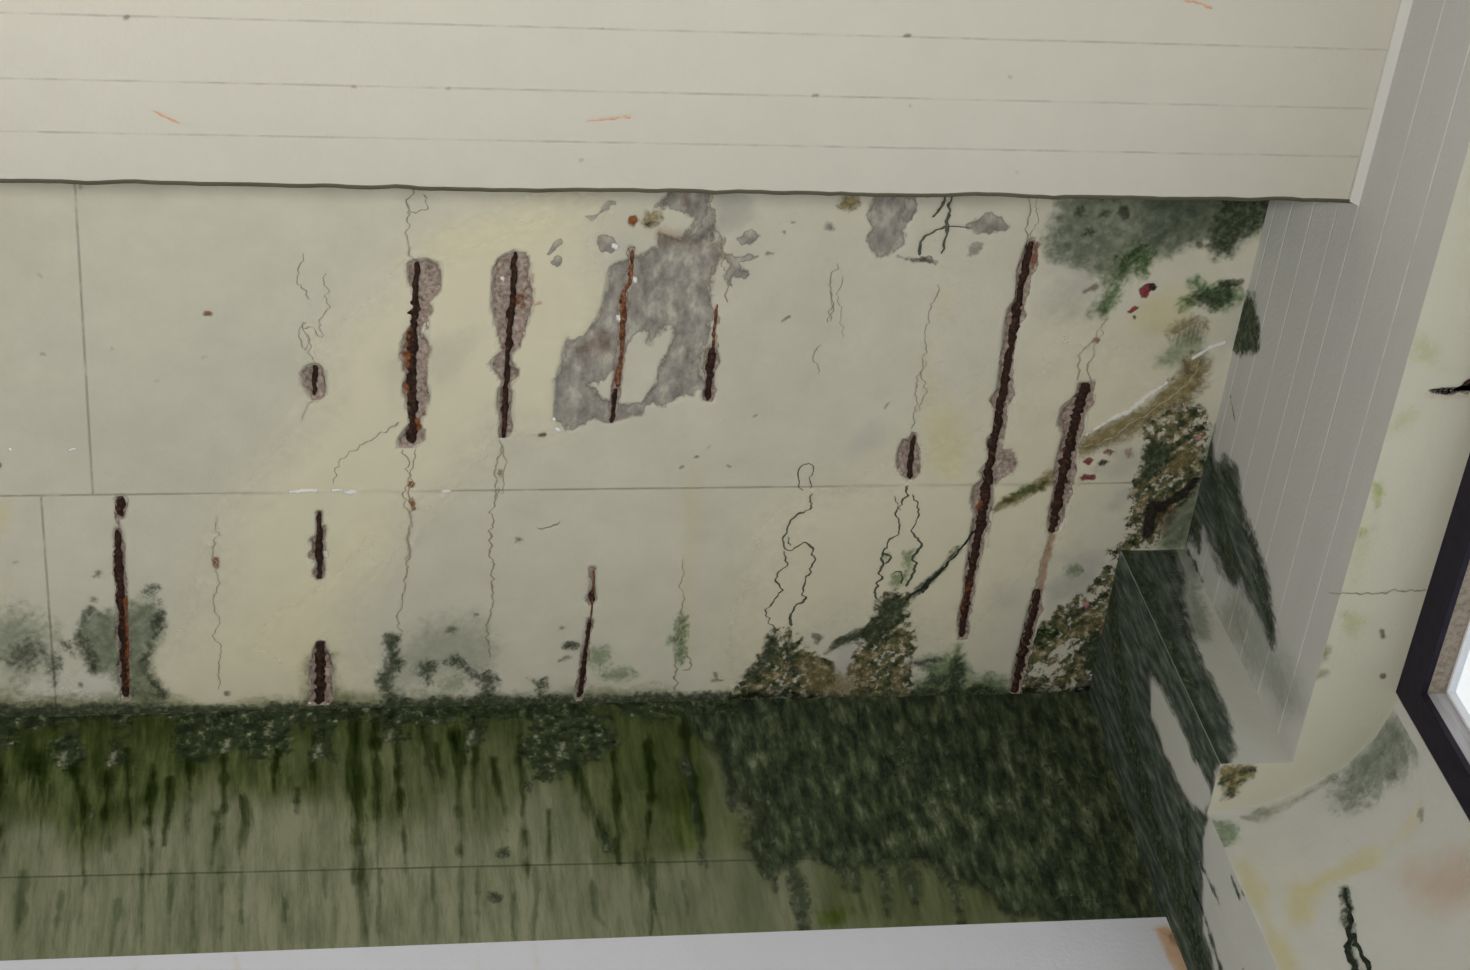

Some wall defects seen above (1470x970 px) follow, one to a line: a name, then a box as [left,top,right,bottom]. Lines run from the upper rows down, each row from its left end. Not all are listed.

peeling [547,239,562,267]
peeling [866,197,1008,265]
peeling [553,192,759,430]
crack [832,340,1226,646]
crack [764,463,816,630]
water stain [69,749,174,844]
water stain [754,854,811,931]
crack [1339,887,1372,970]